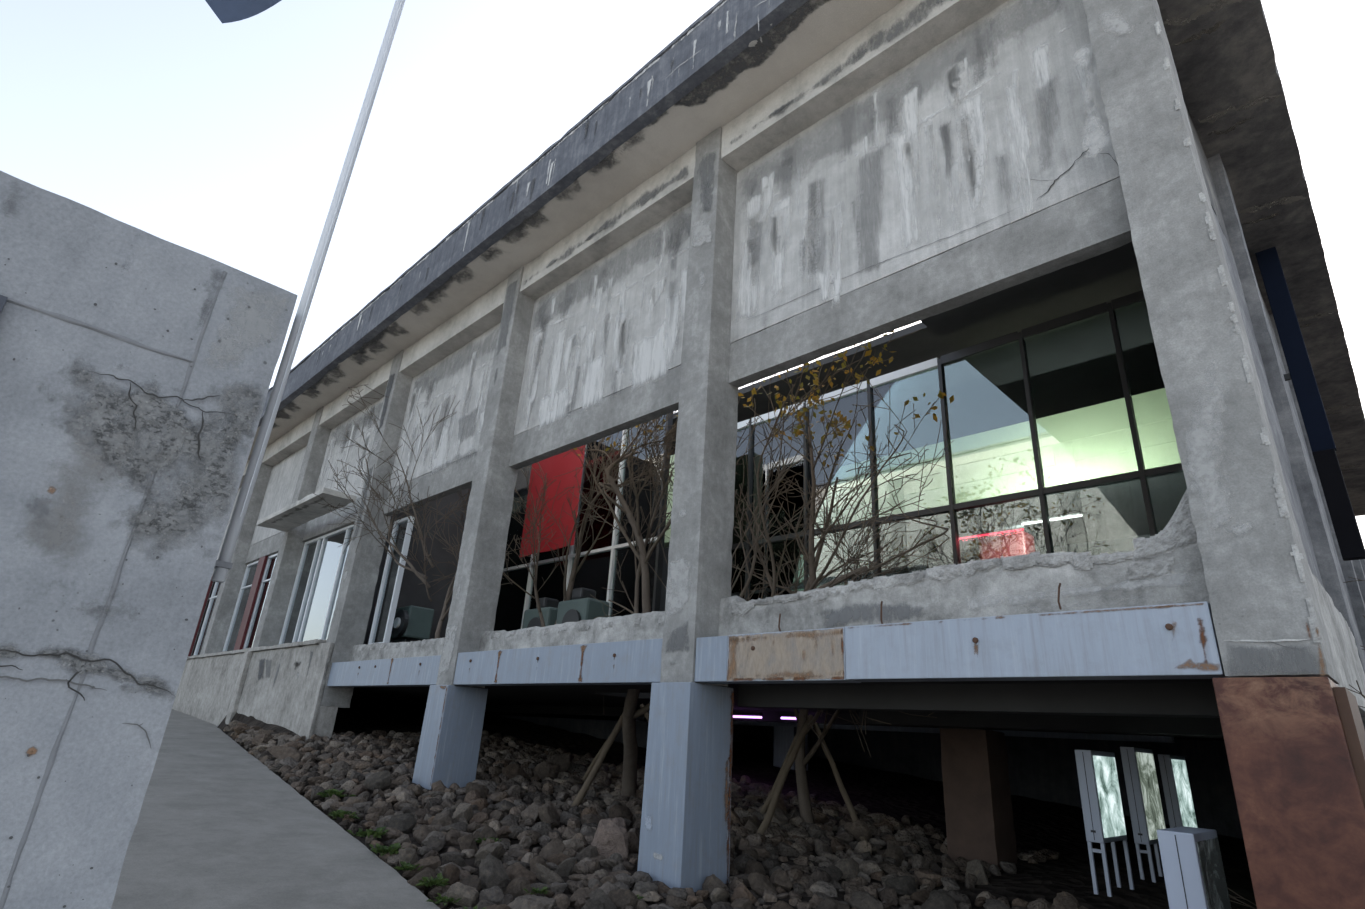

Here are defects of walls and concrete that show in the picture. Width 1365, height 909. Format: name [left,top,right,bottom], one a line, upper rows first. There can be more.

leakage [526,154,715,428]
leakage [737,0,1049,317]
crack [740,135,1118,323]
crack [87,370,231,460]
spalling [731,490,1197,632]
crack [0,649,173,701]
crack [122,723,151,748]
corrosion [724,627,853,883]
corrosion [1042,603,1219,671]